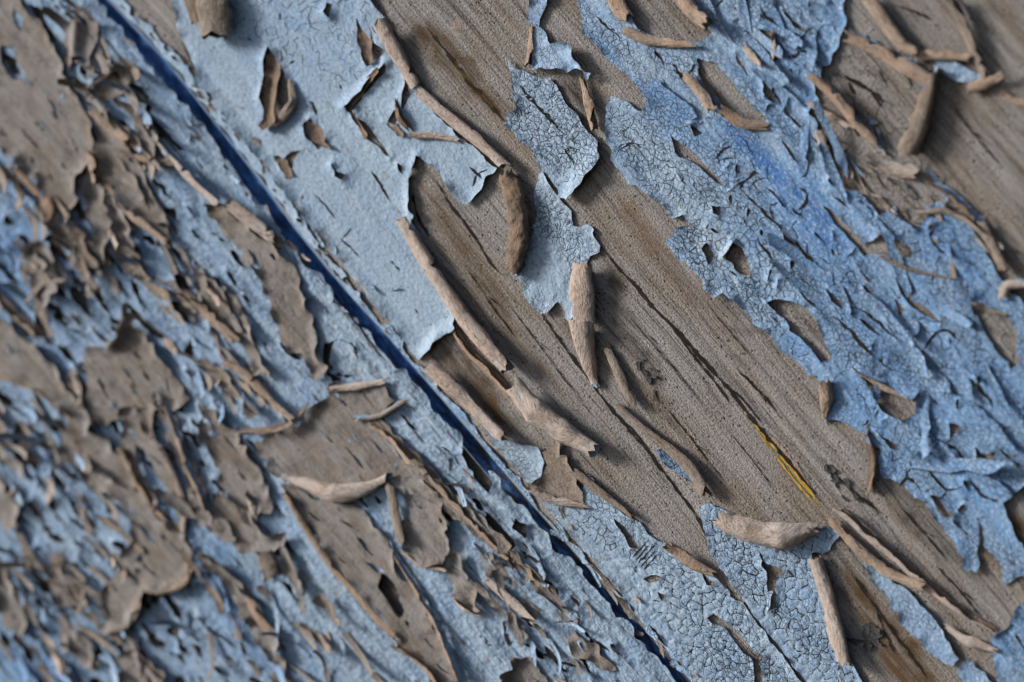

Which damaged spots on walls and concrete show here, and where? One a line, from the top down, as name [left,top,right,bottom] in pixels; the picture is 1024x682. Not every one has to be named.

crack [760,8,778,26]
crack [788,26,814,59]
crack [519,85,574,165]
crack [765,87,790,118]
crack [842,74,884,107]
crack [950,103,1000,165]
crack [737,157,819,267]
crack [929,229,945,254]
peeling [504,0,1024,586]
peeling [111,0,863,682]
crack [593,235,998,617]
peeling [865,565,1024,682]